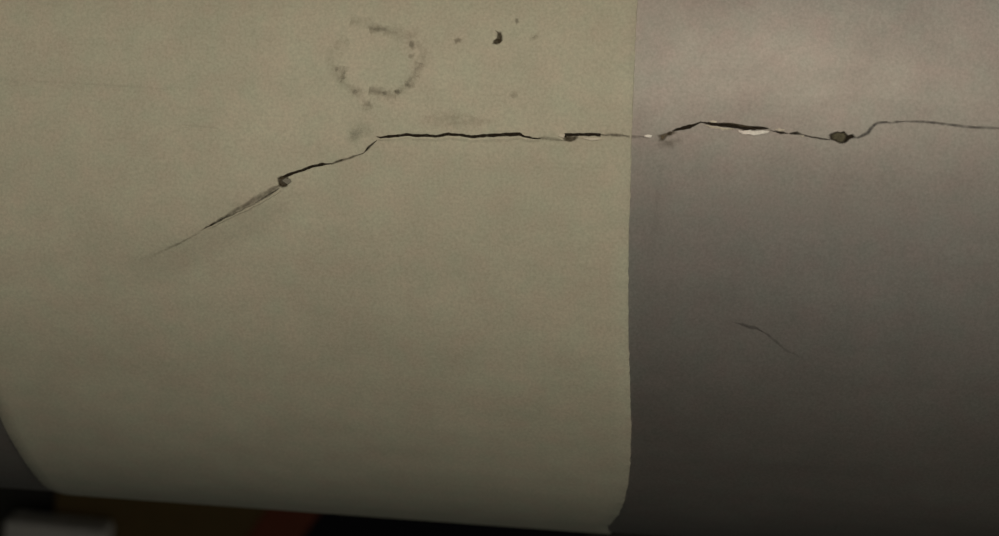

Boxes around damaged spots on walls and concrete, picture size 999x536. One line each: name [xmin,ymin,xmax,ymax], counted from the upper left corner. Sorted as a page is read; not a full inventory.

crack [644,120,980,143]
crack [207,132,601,229]